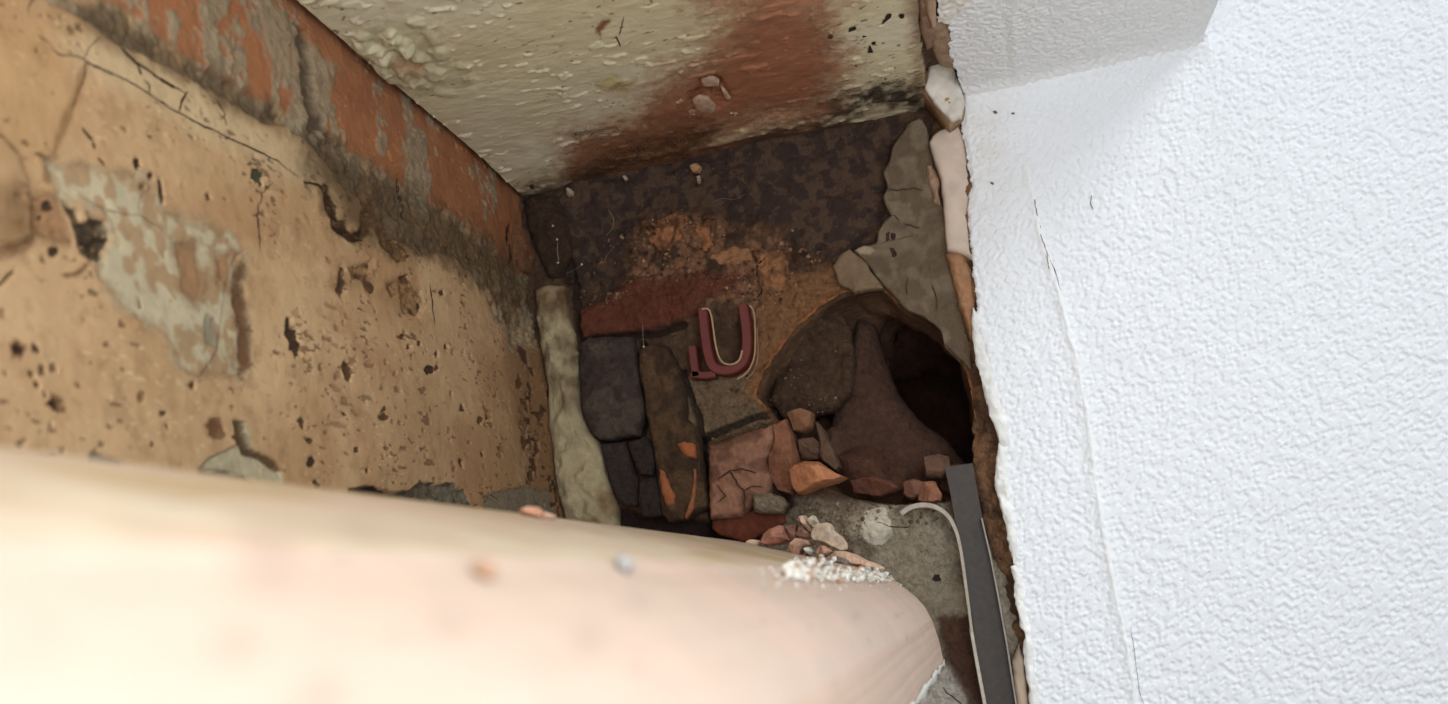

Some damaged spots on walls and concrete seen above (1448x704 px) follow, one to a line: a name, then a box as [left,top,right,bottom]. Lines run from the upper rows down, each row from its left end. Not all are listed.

crack [50,37,333,251]
rust [520,0,849,197]
peeling [30,158,250,389]
peeling [659,468,676,506]
spalling [676,64,1038,704]